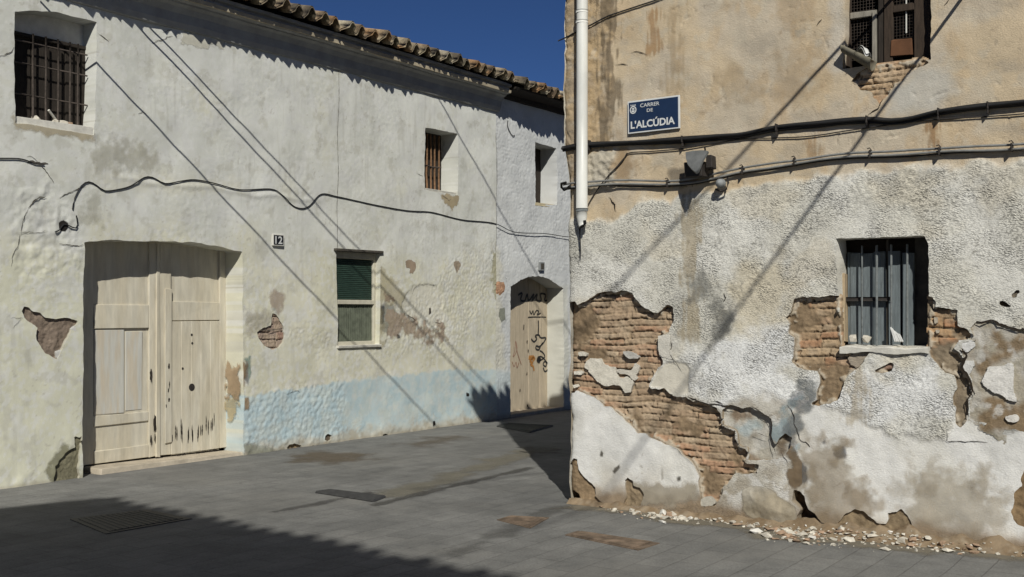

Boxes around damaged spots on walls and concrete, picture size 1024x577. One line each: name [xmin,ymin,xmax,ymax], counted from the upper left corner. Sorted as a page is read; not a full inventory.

spalling [852,56,930,104]
spalling [22,307,76,358]
peeling [224,361,249,421]
spalling [257,314,283,350]
spalling [572,291,792,506]
spalling [788,294,870,406]
spalling [876,363,894,373]
peeling [927,294,1024,444]
spalling [54,436,82,481]
spalling [797,491,818,518]
spalling [839,509,912,530]
spalling [1011,472,1024,527]